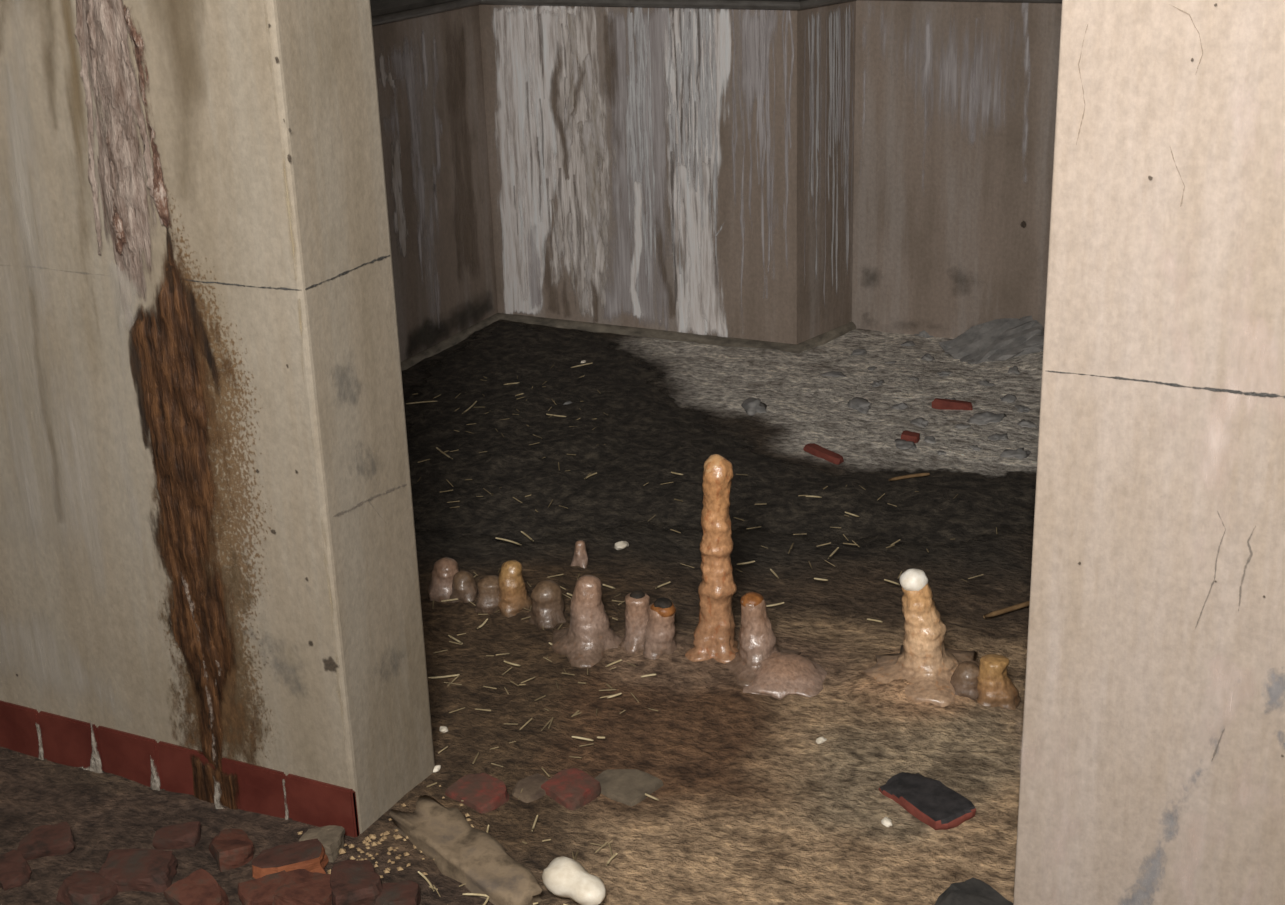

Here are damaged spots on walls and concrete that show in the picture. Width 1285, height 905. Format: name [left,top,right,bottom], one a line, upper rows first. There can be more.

damp [905,24,1001,141]
damp [1022,3,1030,85]
damp [379,5,865,356]
crack [181,255,390,290]
crack [1048,371,1285,398]
rust [129,205,272,810]
crack [1196,511,1252,626]